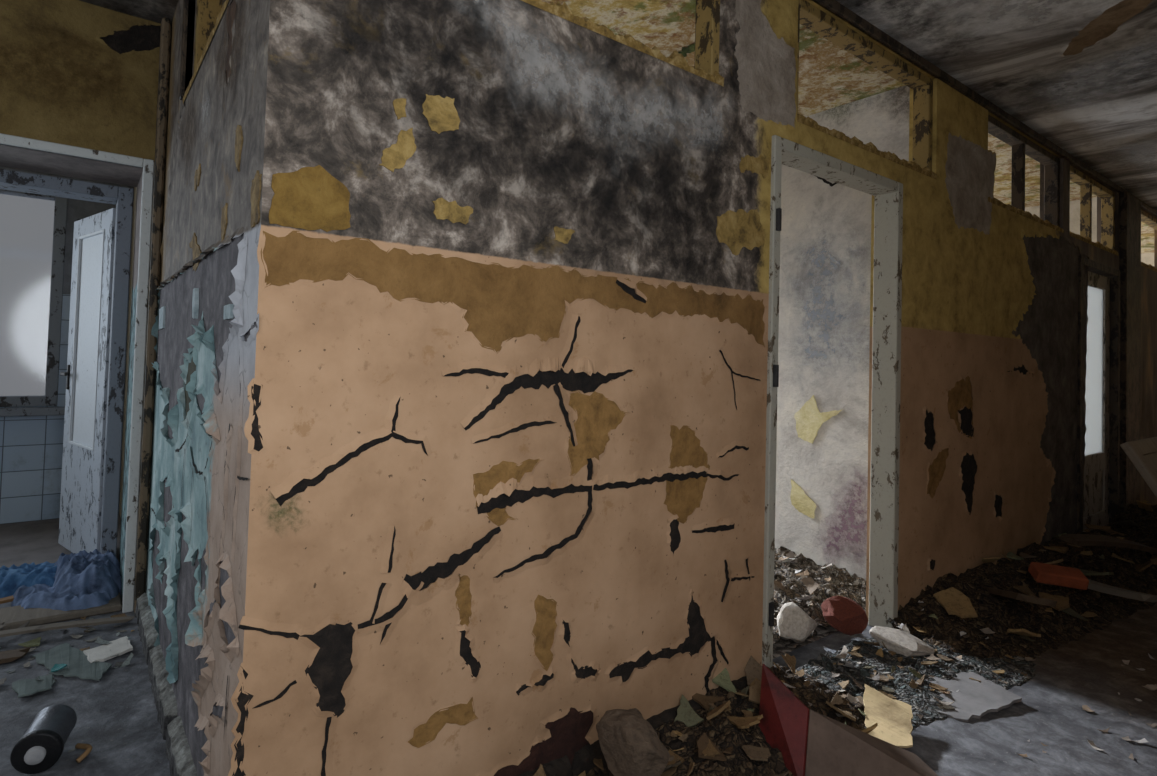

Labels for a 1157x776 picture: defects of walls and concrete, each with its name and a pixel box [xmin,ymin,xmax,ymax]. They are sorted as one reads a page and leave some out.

spalling [95,21,161,57]
damp [506,30,721,150]
peeling [521,0,1118,558]
peeling [151,224,766,457]
crack [150,298,432,640]
peeling [470,456,546,528]
crack [358,314,761,645]
peeling [148,473,258,776]
crack [224,675,297,731]
crack [321,716,339,776]
crack [704,633,731,692]